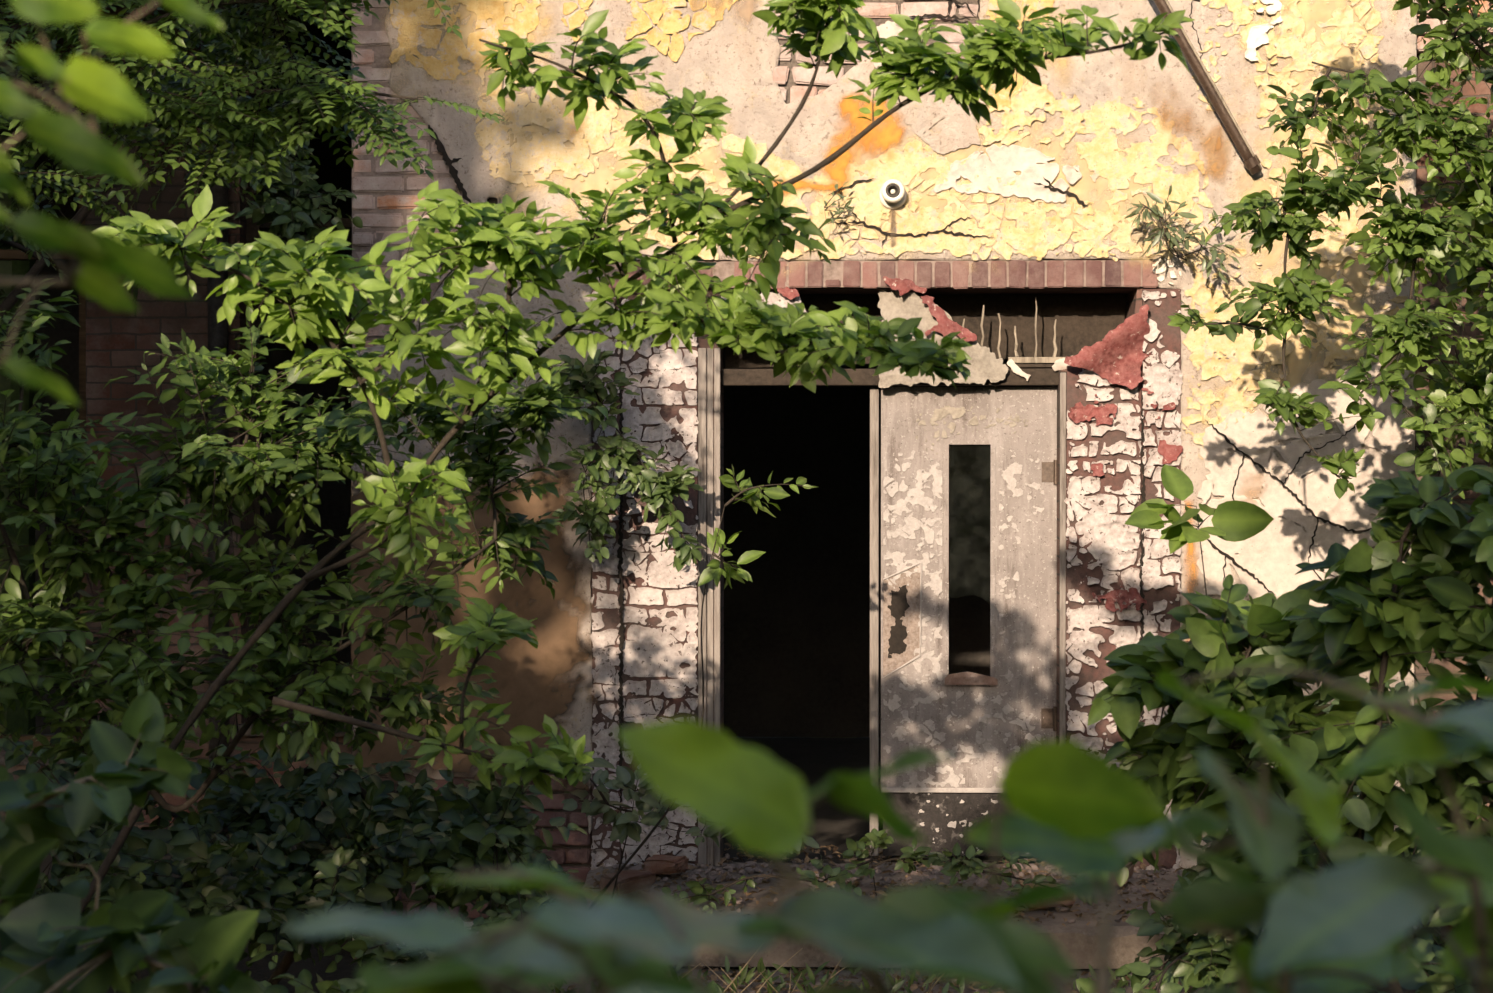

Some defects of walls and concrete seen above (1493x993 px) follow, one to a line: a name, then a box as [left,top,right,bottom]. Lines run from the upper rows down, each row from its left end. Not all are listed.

rust [760,94,903,194]
peeling [351,0,1408,769]
peeling [590,291,699,870]
peeling [883,406,1044,853]
crack [1207,539,1275,595]
crack [1207,404,1381,581]
peeling [1142,844,1182,870]